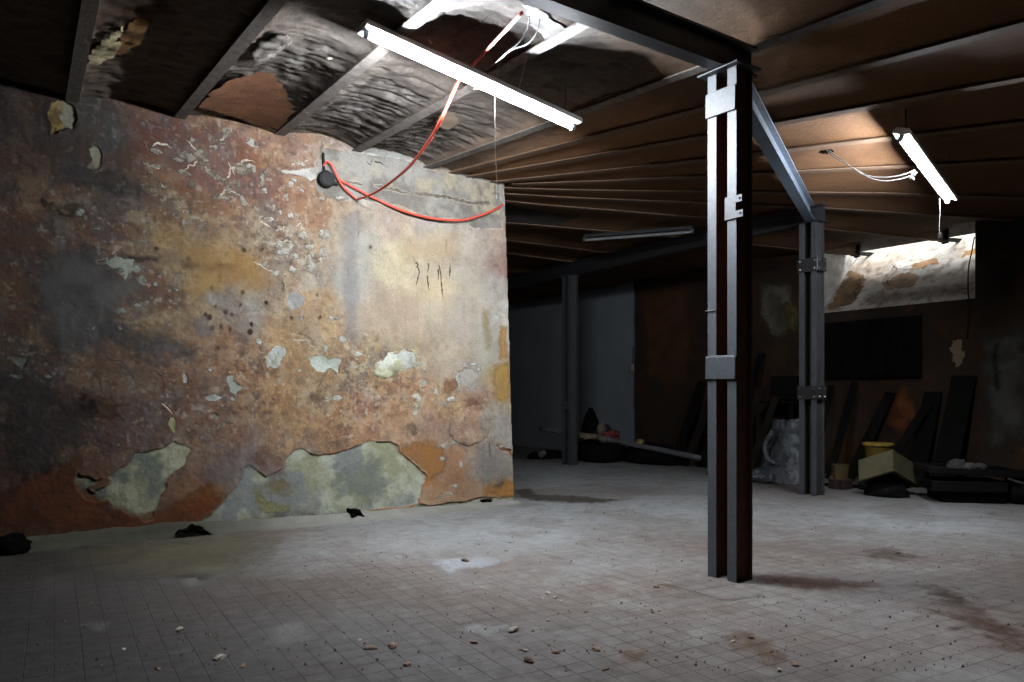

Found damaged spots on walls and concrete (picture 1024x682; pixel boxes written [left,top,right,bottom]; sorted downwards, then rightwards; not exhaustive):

spalling [88,18,150,66]
flaking render [45,98,80,137]
flaking render [828,270,866,310]
flaking render [882,258,939,291]
peeling [310,354,345,376]
flaking render [373,348,427,415]
corrosion [444,379,456,394]
corrosion [494,327,510,401]
corrosion [0,463,222,535]
peeling [73,415,193,523]
peeling [175,440,514,538]
corrosion [402,442,446,479]